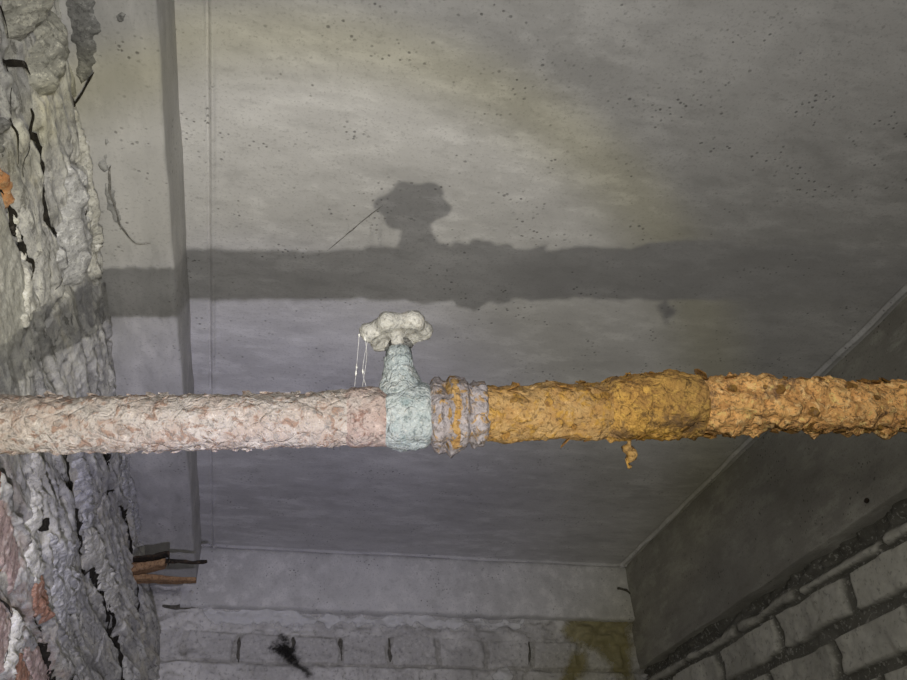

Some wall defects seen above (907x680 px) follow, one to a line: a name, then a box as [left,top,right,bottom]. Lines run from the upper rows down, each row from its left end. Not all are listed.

spalling [66,0,101,97]
spalling [0,117,12,157]
flaking render [0,169,37,331]
flaking render [74,109,104,286]
flaking render [0,447,121,680]
water stain [562,621,631,680]